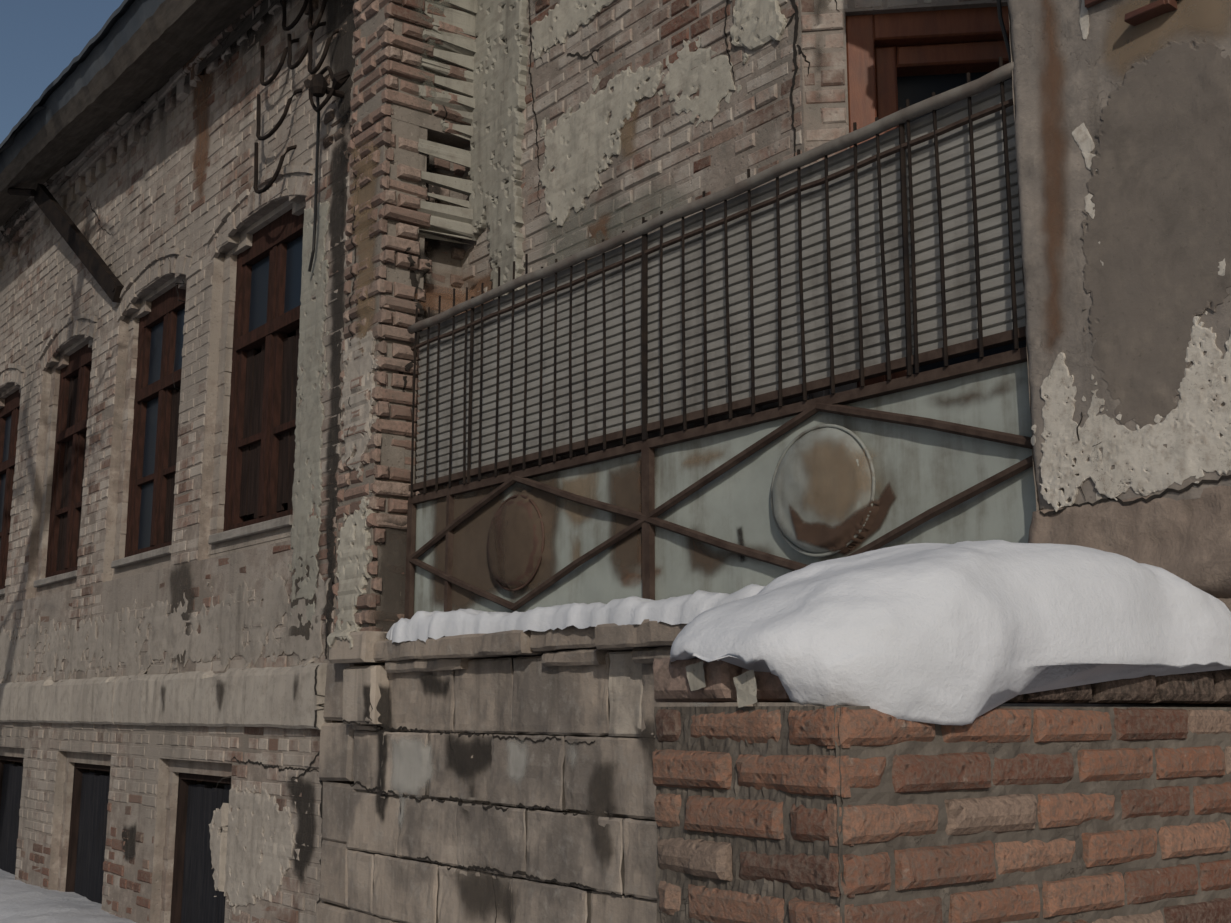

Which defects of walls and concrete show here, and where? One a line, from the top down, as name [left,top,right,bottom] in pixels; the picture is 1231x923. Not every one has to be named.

flaking render [528,0,787,226]
crack [785,0,810,156]
flaking render [1079,0,1089,40]
flaking render [1031,311,1231,512]
leakage [432,475,561,611]
leakage [609,464,642,576]
corrosion [789,442,895,555]
crack [1040,474,1231,516]
flaking render [209,785,295,923]
leakage [287,778,315,881]
leakage [364,686,432,823]
leakage [447,737,492,798]